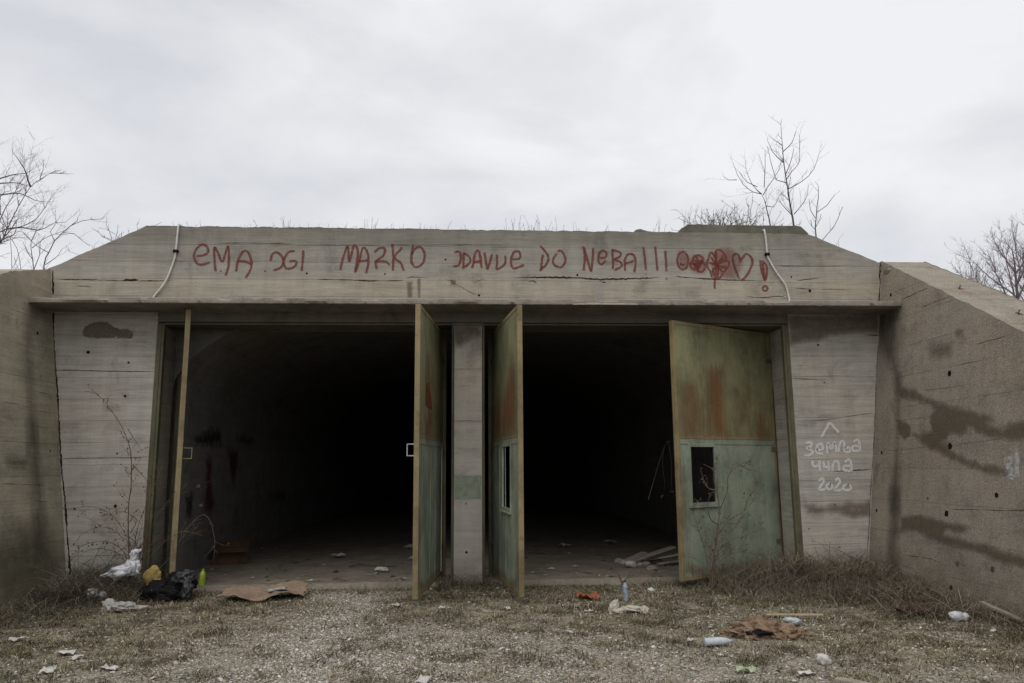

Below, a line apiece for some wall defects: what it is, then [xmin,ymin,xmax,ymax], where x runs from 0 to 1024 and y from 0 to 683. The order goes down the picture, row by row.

damp [898,389,1024,472]
damp [902,516,1024,565]